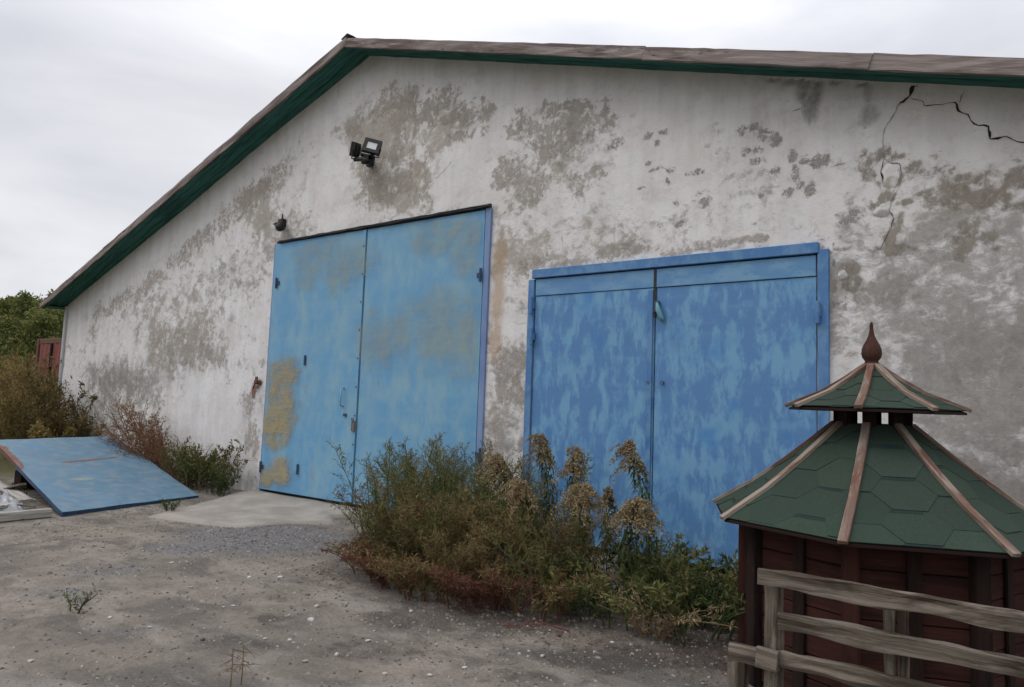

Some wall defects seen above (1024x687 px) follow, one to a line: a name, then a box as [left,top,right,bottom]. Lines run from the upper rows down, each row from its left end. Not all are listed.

flaking render [348,82,497,205]
flaking render [490,98,617,210]
flaking render [737,123,830,197]
flaking render [835,147,1024,262]
crack [845,85,1024,310]
flaking render [832,243,915,306]
corrosion [252,360,298,487]